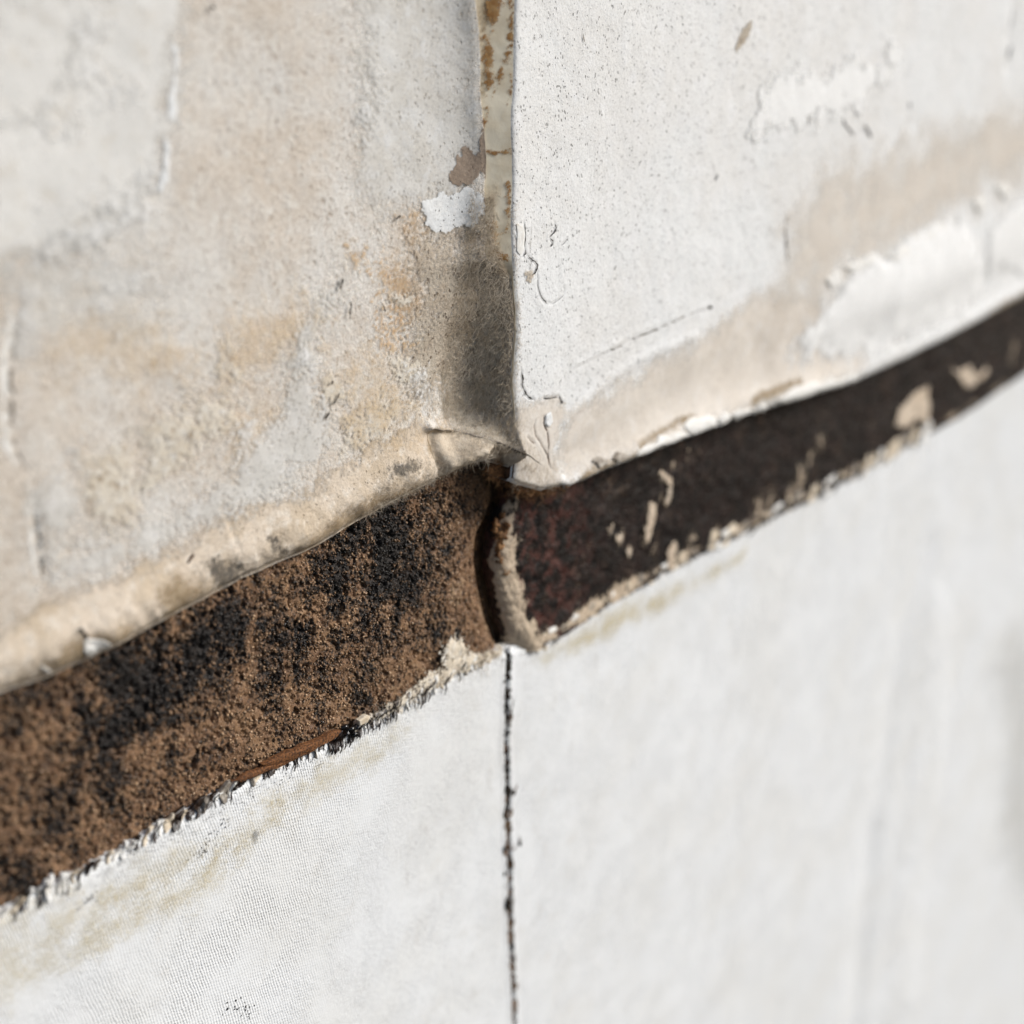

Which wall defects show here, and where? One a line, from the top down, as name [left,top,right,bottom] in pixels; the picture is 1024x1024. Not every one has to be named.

rust [480,0,514,105]
peeling [319,0,512,454]
rust [486,181,511,262]
spalling [76,336,258,543]
peeling [534,385,931,653]
peeling [514,183,1024,489]
peeling [78,628,112,657]
peeling [356,633,514,732]
crack [503,637,522,1024]